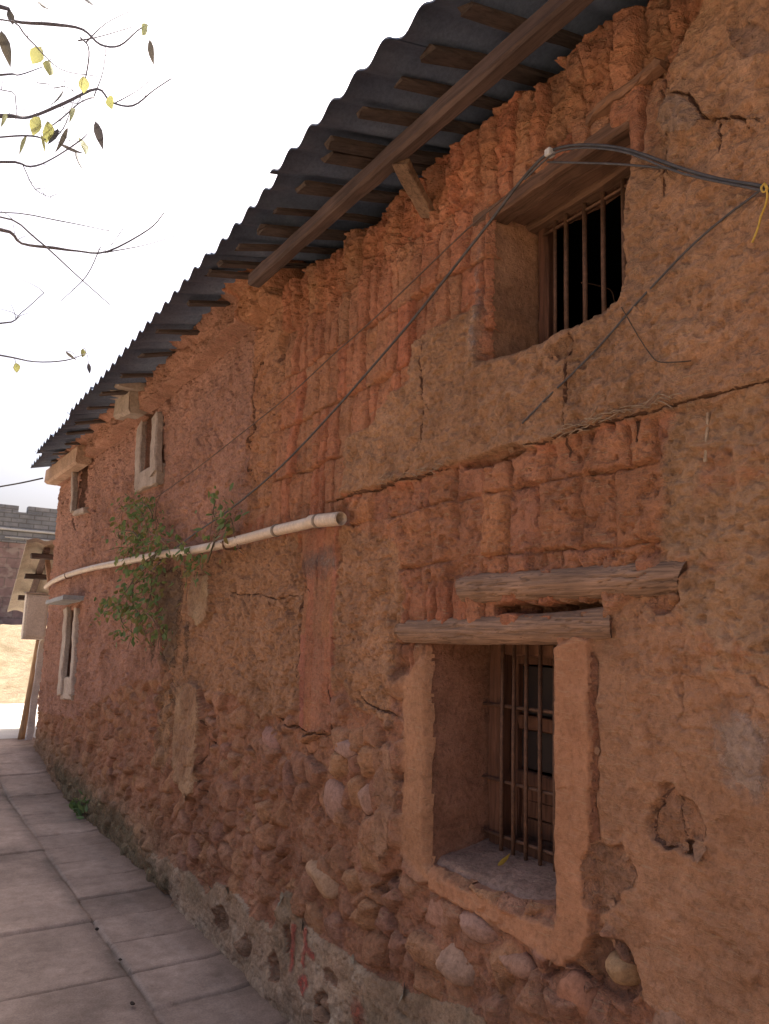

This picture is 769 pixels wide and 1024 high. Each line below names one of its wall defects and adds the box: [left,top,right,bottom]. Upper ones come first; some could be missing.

crack [661,90,758,151]
crack [328,341,451,503]
crack [526,333,769,457]
spalling [648,783,706,865]